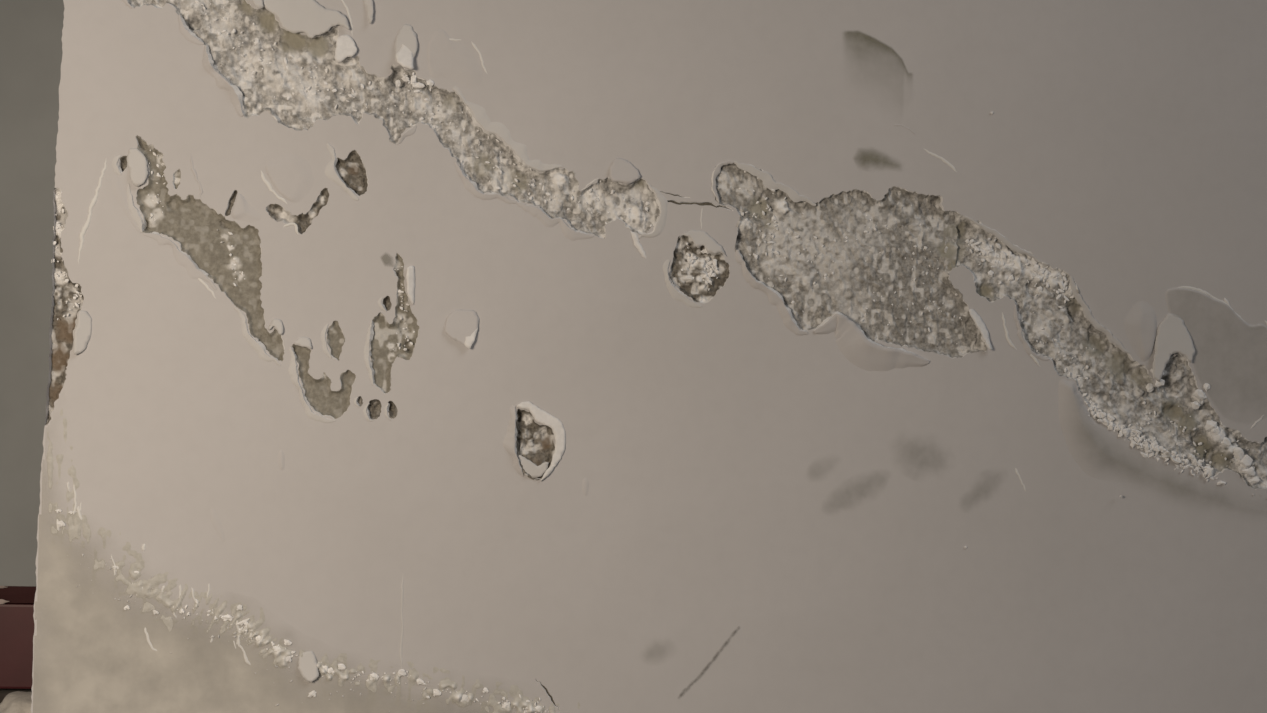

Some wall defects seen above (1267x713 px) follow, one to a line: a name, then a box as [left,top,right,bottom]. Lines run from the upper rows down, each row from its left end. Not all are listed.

flaking render [122,0,668,258]
flaking render [46,188,92,425]
flaking render [112,135,419,423]
water stain [33,409,560,713]
flaking render [503,401,566,481]
flaking render [663,161,1267,496]